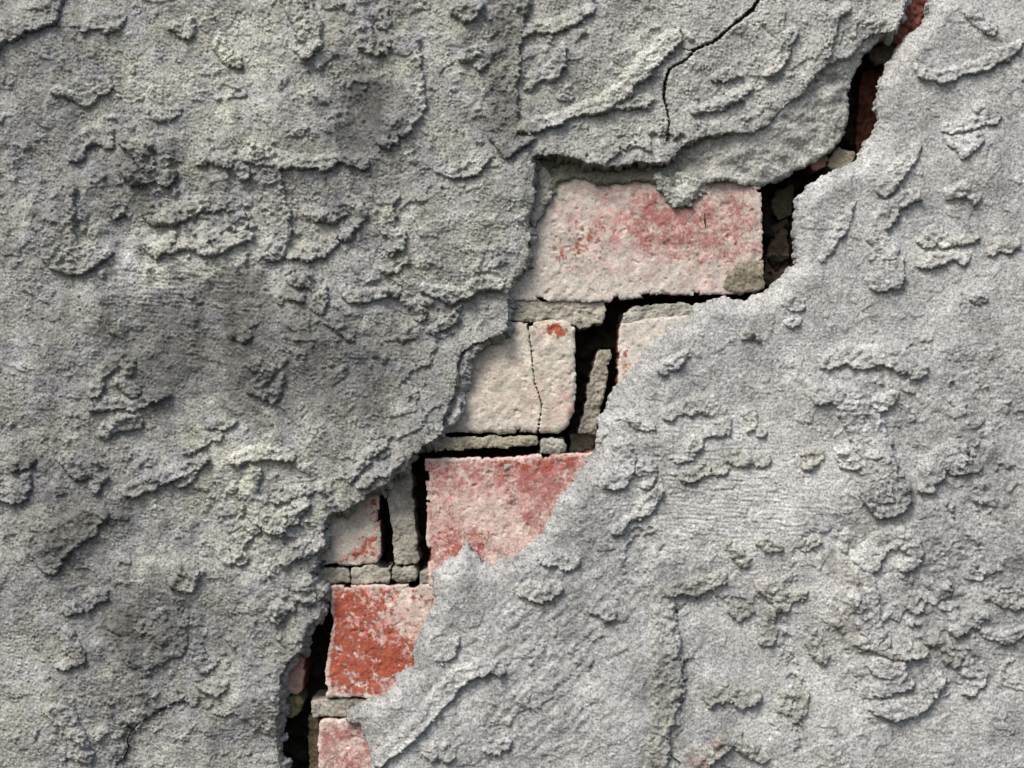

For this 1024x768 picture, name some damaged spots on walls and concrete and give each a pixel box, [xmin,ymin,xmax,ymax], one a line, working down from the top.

crack [663,0,759,140]
flaking render [529,34,885,270]
peeling [535,323,570,338]
crack [381,64,868,580]
flaking render [437,339,492,441]
peeling [340,499,377,562]
peeling [431,455,586,561]
flaking render [267,654,300,761]
crack [282,584,334,768]
peeling [322,723,369,768]
peeling [305,587,434,695]